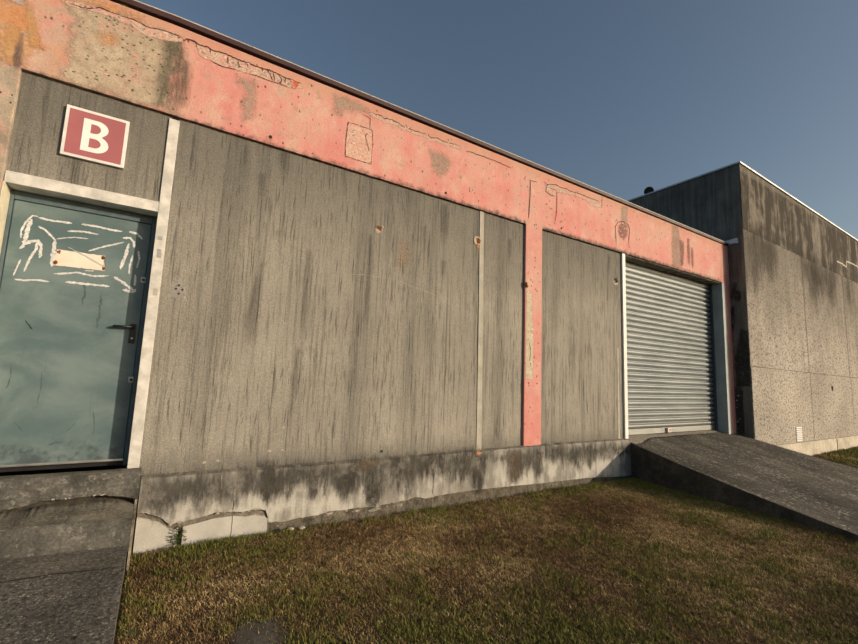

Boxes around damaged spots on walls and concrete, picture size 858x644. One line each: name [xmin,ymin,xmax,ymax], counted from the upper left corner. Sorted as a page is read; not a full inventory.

peeling [63,0,184,112]
peeling [335,96,461,174]
water stain [308,476,318,498]
water stain [460,451,486,490]
crack [0,494,267,529]